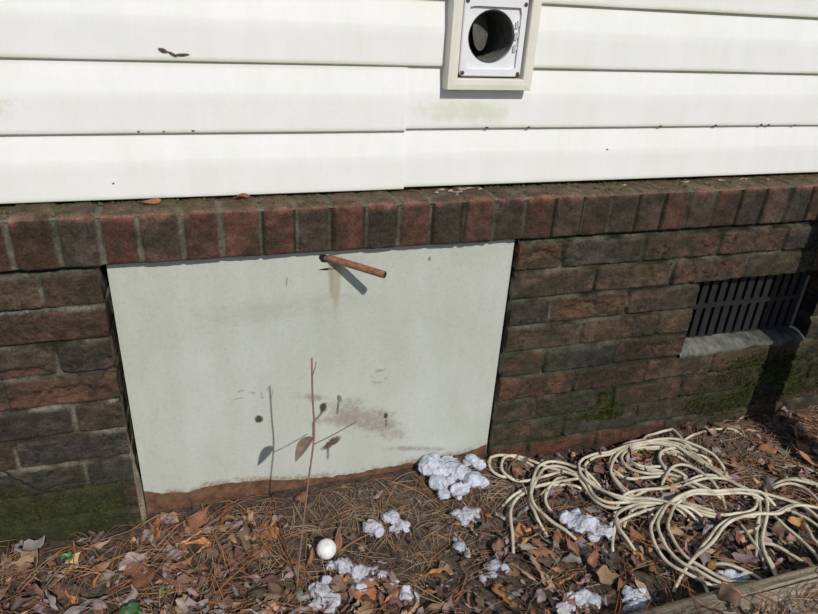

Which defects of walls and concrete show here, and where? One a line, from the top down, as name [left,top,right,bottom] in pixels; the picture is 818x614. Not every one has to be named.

rust [454,444,487,458]
rust [144,461,419,514]